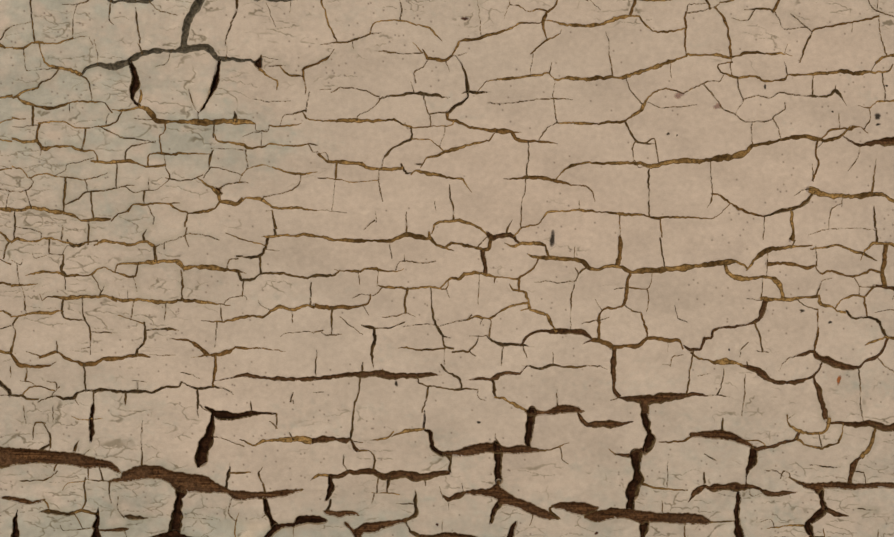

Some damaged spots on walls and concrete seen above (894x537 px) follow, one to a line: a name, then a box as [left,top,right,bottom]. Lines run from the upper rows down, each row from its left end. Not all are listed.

crack [0,0,894,203]
crack [0,173,894,511]
crack [0,496,19,537]
crack [62,478,147,520]
crack [168,491,213,532]
peeling [0,407,476,537]
crack [400,490,419,521]
peeling [439,392,737,537]
peeling [660,418,801,487]
crack [687,472,797,537]
peeling [761,470,894,537]